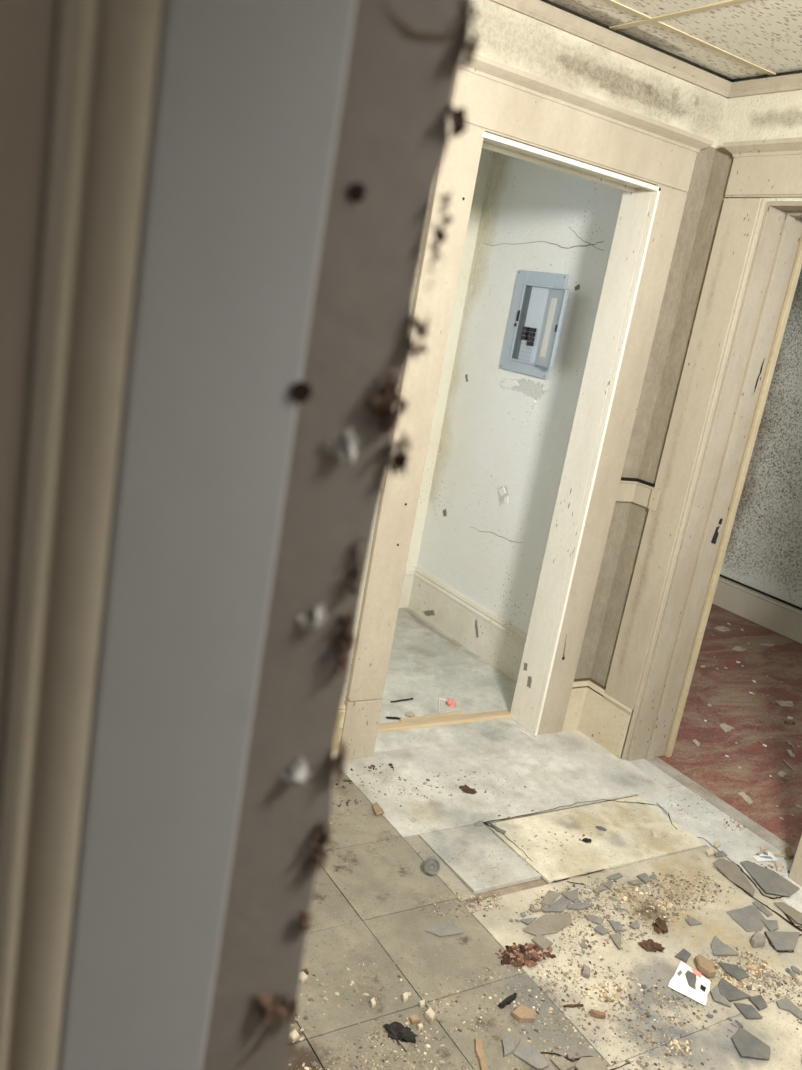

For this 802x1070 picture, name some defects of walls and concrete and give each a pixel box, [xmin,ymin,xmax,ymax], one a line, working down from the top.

peeling [459,0,479,73]
peeling [448,104,467,138]
crack [484,227,604,251]
peeling [407,190,453,360]
leakage [724,273,802,592]
peeling [561,890,633,919]
peeling [741,964,800,990]
peeling [706,1009,743,1033]